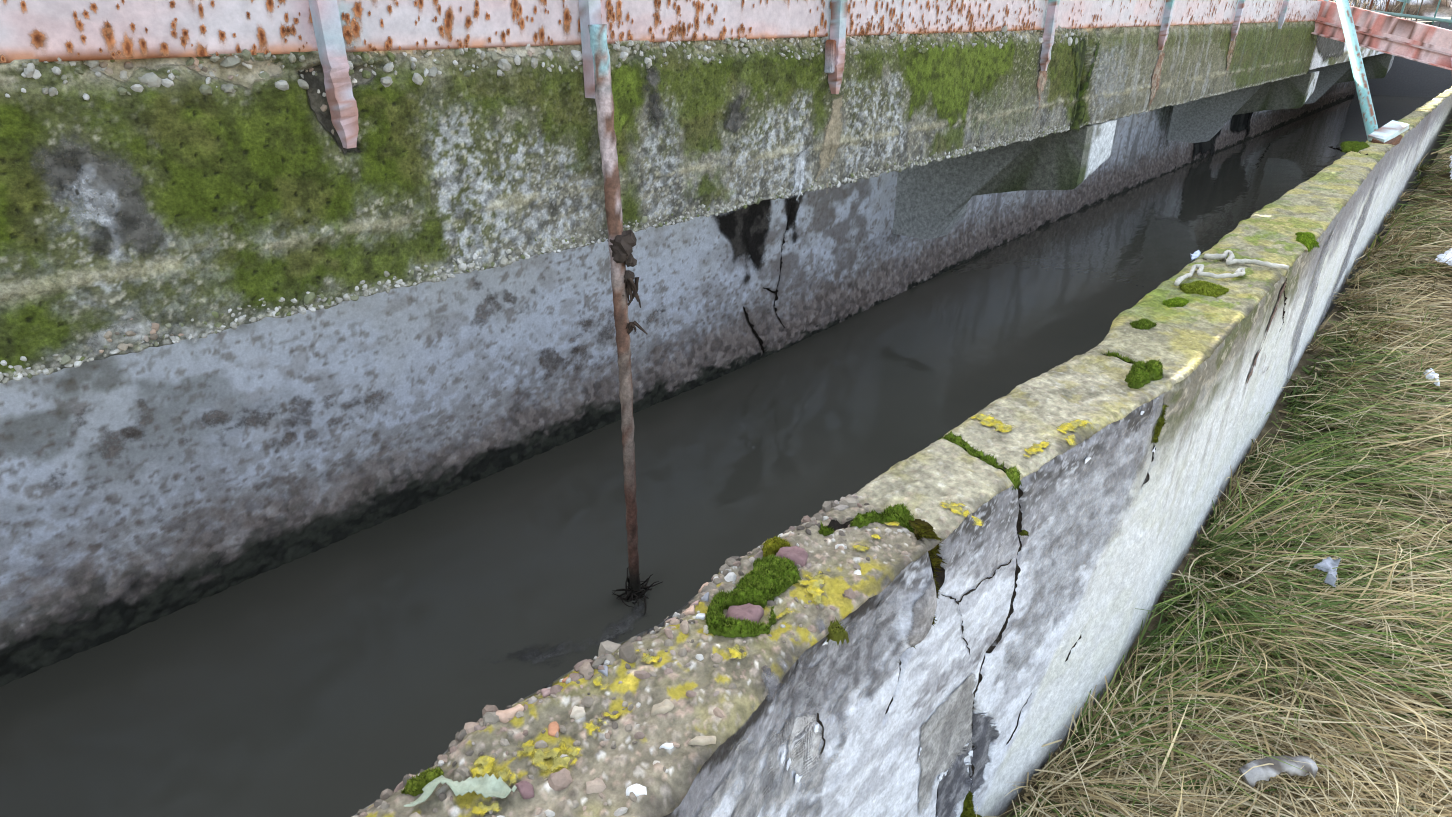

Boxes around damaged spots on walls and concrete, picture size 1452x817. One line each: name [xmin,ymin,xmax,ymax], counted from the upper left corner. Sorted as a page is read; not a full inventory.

corrosion [30,29,46,49]
corrosion [65,0,318,59]
corrosion [341,0,581,51]
corrosion [600,0,768,42]
corrosion [788,0,1319,37]
damp [472,283,515,324]
crack [743,204,792,353]
damp [103,401,153,459]
damp [202,391,384,452]
crack [828,518,854,532]
crack [913,435,1032,781]
peeling [918,674,999,817]